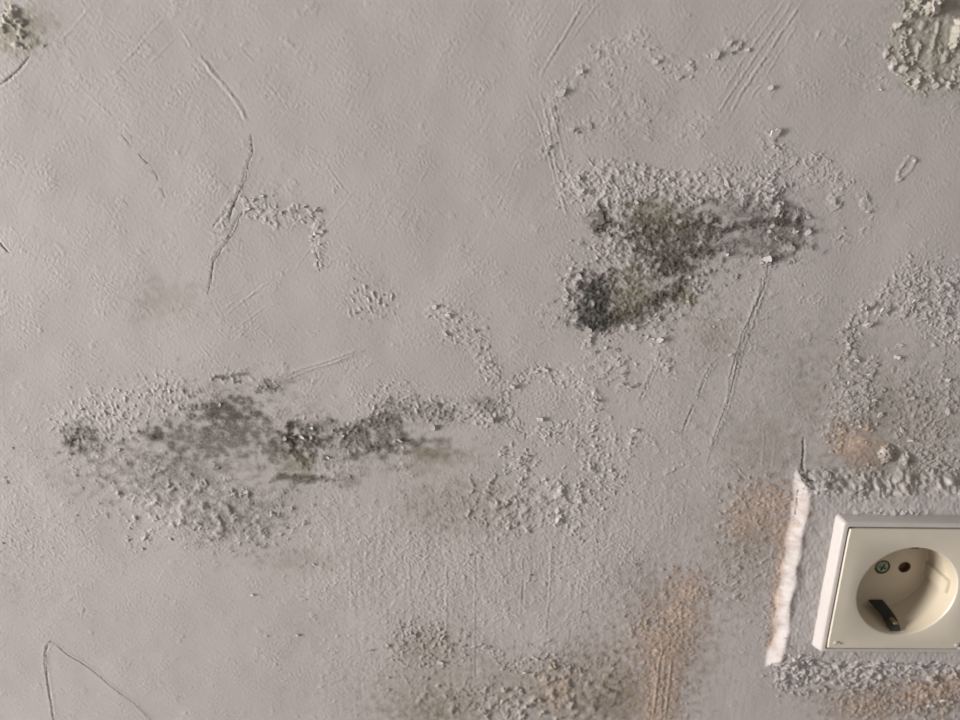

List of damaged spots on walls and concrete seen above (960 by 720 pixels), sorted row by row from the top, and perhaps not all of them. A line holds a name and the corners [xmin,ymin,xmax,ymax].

spalling [883,0,960,107]
crack [207,136,253,294]
peeling [208,182,329,275]
mould [577,204,710,331]
peeling [418,122,878,478]
mould [190,396,268,432]
mould [278,421,331,483]
peeling [611,336,960,720]
crack [45,641,150,720]